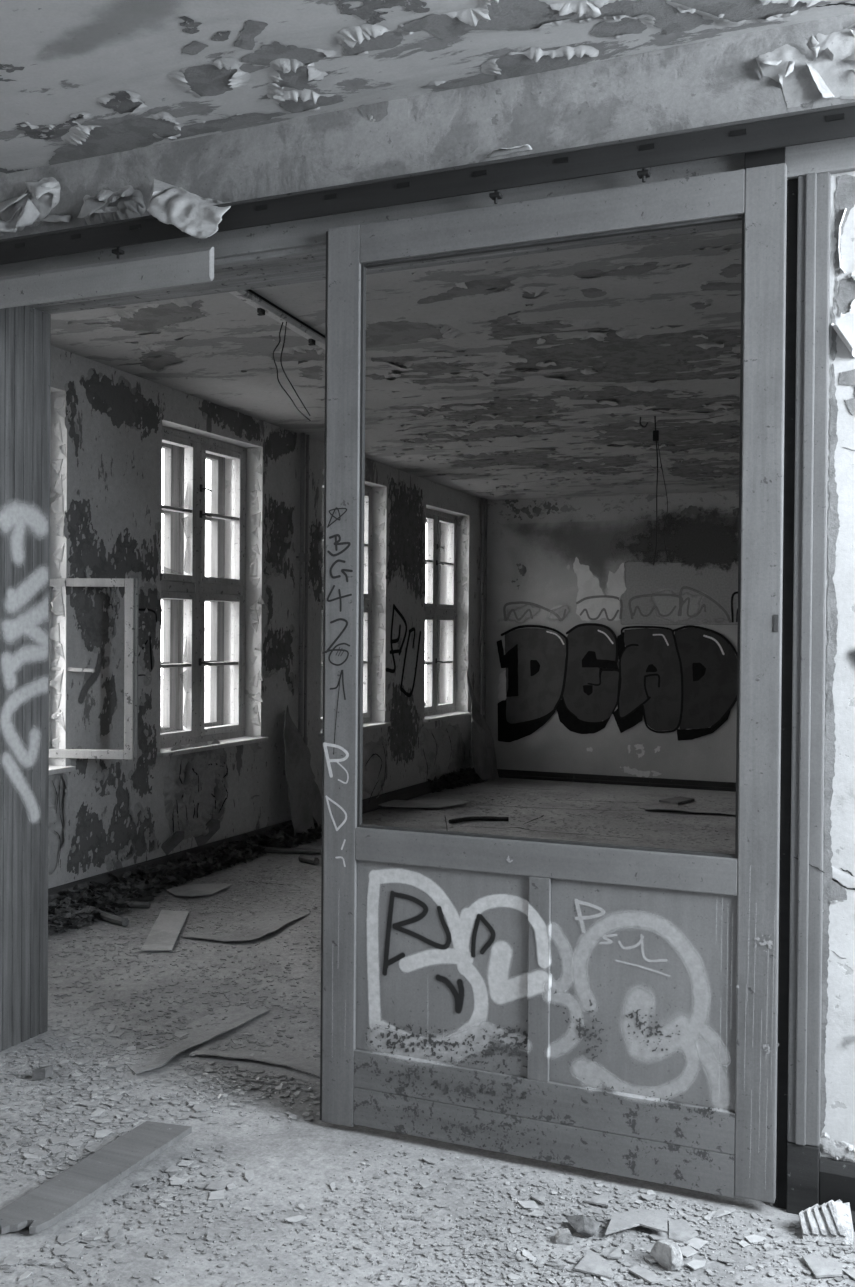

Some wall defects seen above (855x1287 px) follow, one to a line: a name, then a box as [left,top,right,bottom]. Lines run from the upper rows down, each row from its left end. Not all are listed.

peeling [0,64,25,82]
peeling [235,320,325,401]
peeling [365,255,741,520]
peeling [573,242,742,310]
peeling [48,298,220,879]
peeling [199,400,324,726]
peeling [362,477,426,784]
peeling [458,516,469,705]
peeling [498,670,506,700]
water stain [529,507,739,576]
peeling [620,744,662,778]
peeling [820,174,855,1151]